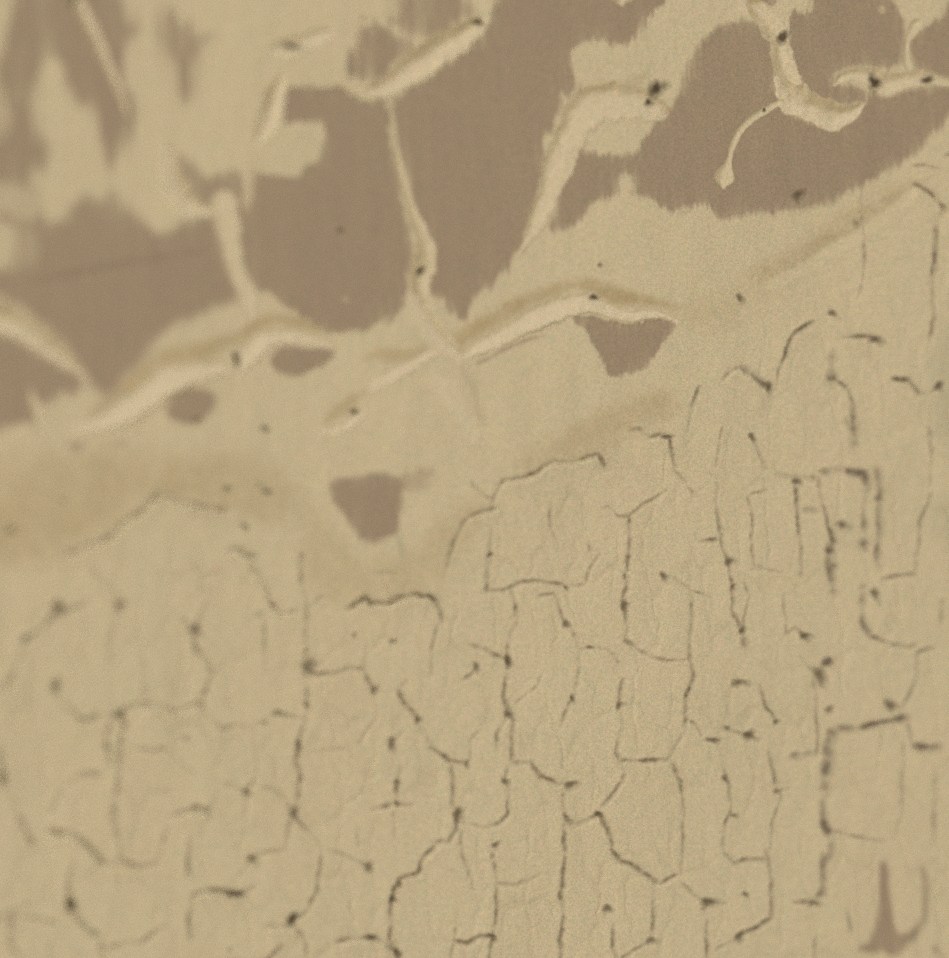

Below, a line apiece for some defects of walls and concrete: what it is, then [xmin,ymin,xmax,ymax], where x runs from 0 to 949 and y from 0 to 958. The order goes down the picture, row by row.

peeling [0,0,949,441]
crack [851,187,869,297]
peeling [325,462,443,548]
crack [0,303,948,958]